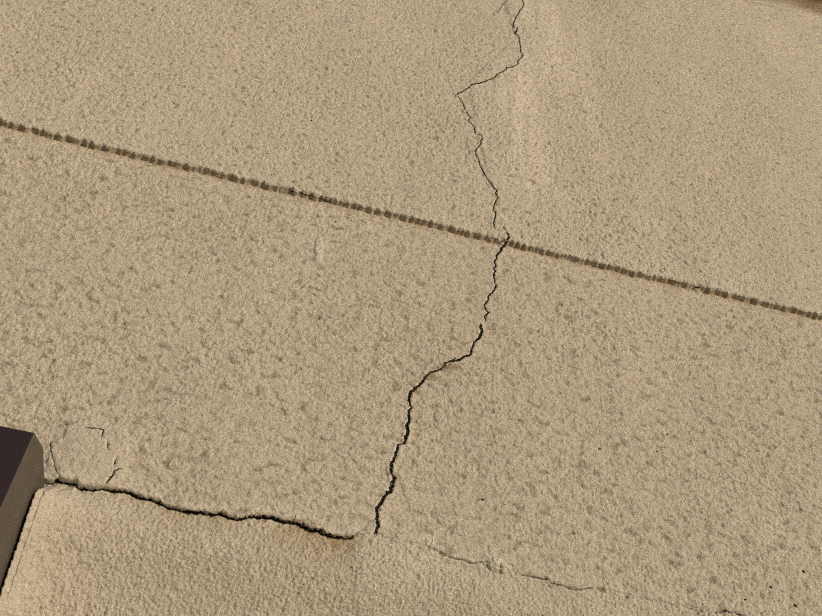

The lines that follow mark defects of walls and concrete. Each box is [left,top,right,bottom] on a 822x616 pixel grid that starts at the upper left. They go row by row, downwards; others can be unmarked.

crack [8,0,524,593]